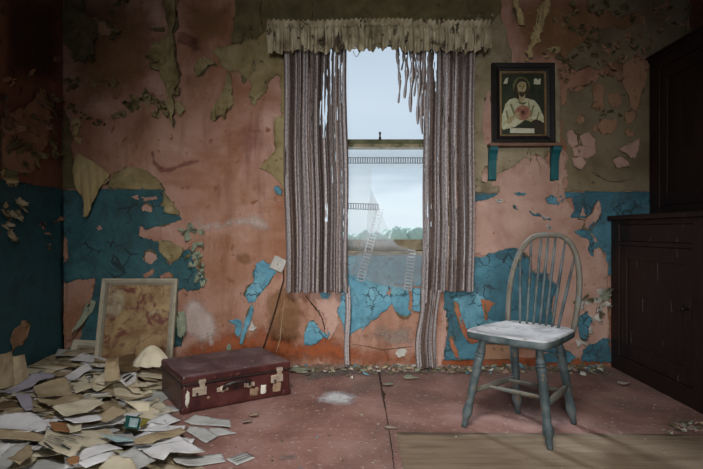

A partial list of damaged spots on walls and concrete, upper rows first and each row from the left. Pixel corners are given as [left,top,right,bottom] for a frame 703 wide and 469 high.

peeling [0,65,208,366]
peeling [194,0,693,365]
crack [306,296,326,342]
water stain [186,289,456,379]
crack [353,344,410,469]